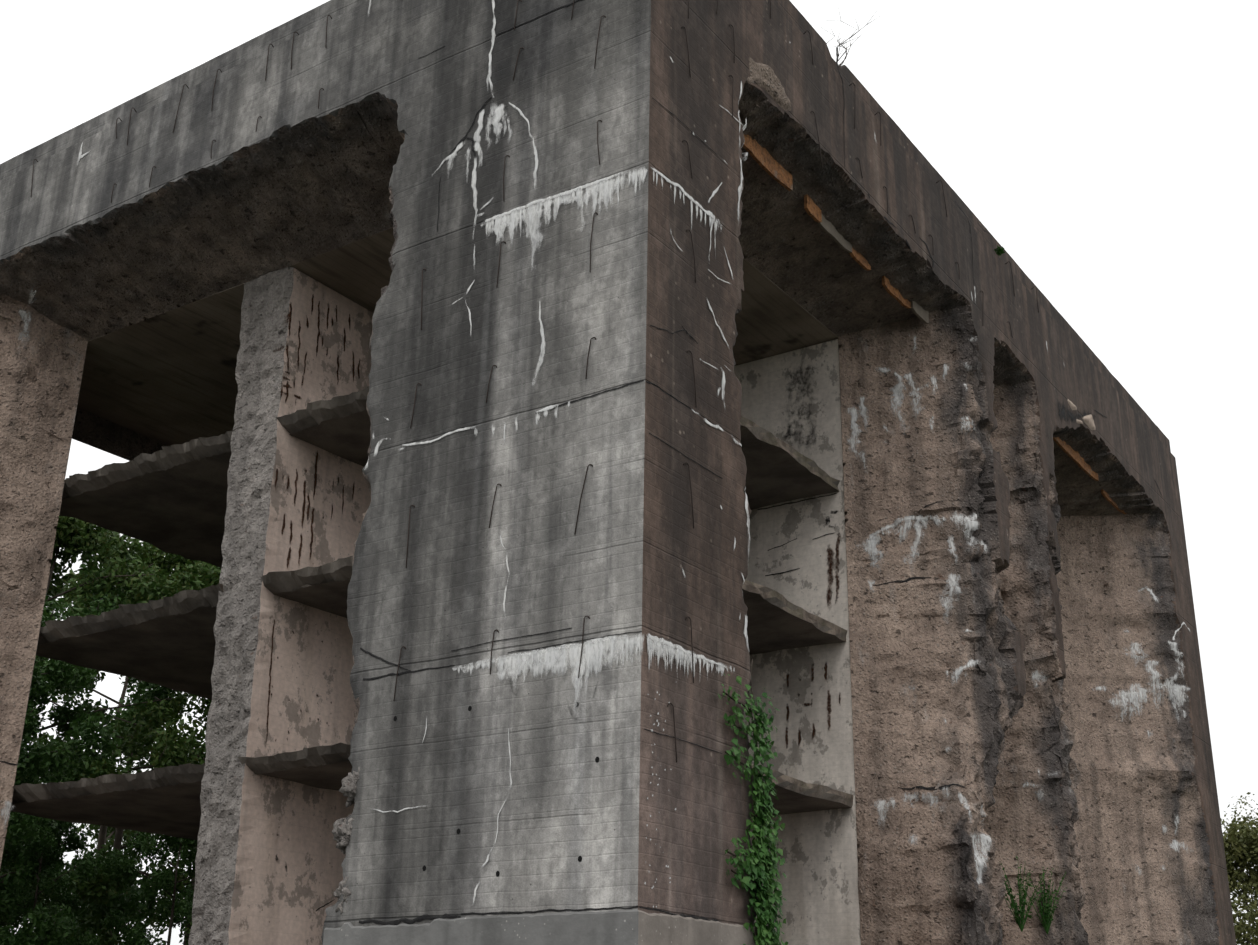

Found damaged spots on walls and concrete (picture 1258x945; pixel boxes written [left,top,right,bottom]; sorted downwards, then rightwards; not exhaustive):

crack [437,0,580,231]
damp [439,141,717,263]
crack [453,281,474,333]
spalling [1058,399,1107,430]
damp [868,514,986,565]
crack [873,577,931,586]
damp [944,574,961,608]
damp [453,634,735,698]
damp [1096,641,1190,717]